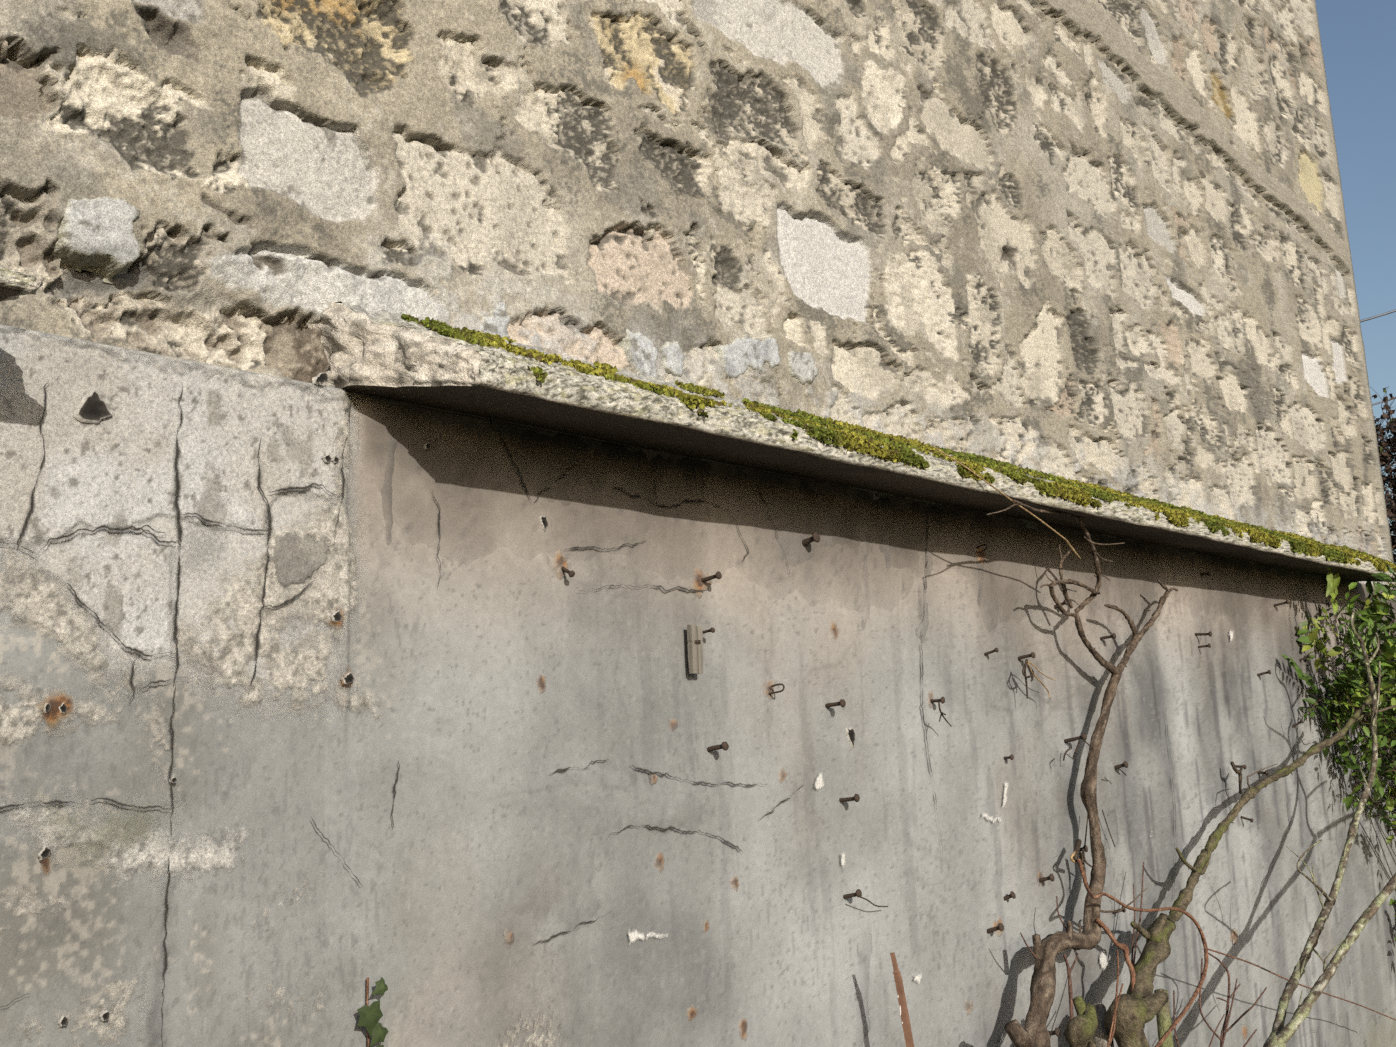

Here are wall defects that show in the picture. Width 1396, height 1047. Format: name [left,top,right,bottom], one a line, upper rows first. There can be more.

leakage [0,383,359,710]
flaking render [0,325,382,718]
rust [551,550,568,580]
rust [689,567,712,599]
rust [829,621,839,641]
leakage [1288,592,1317,716]
rust [45,694,72,725]
crack [0,381,351,1047]
crack [551,759,803,819]
crack [612,825,742,851]
leakage [852,918,873,1047]
leakage [1305,950,1351,1047]